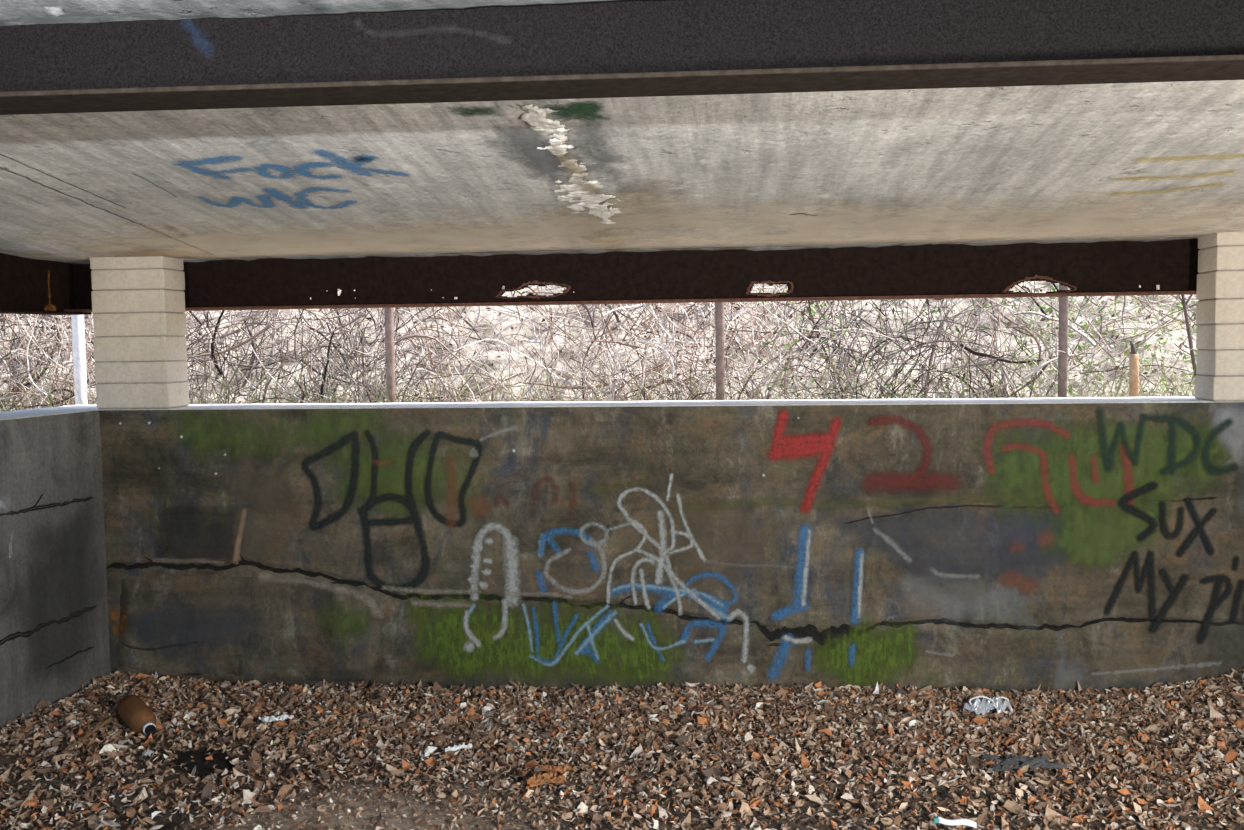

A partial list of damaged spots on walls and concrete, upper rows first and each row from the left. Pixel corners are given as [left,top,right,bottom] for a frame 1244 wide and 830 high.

crack [0,154,214,255]
water stain [500,104,646,242]
crack [0,493,94,516]
crack [0,605,97,645]
crack [46,641,202,676]
crack [106,538,1244,646]